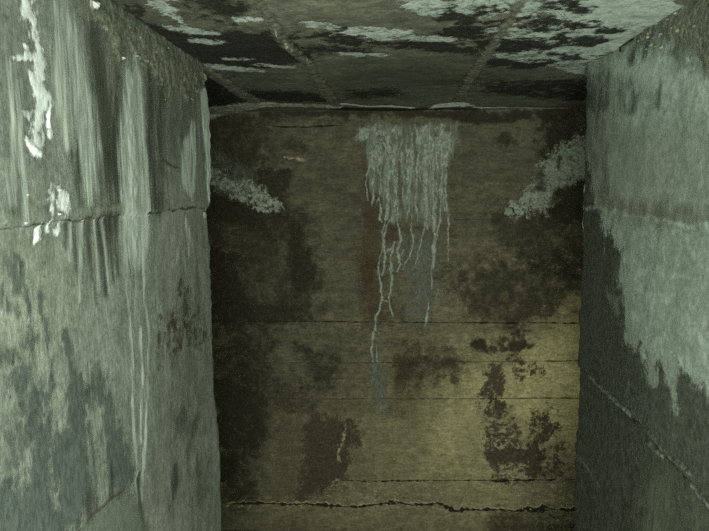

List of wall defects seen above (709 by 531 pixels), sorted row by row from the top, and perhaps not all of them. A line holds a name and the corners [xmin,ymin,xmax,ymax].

water stain [0,0,166,531]
crack [222,478,575,526]
water stain [123,0,709,133]
water stain [205,76,709,531]